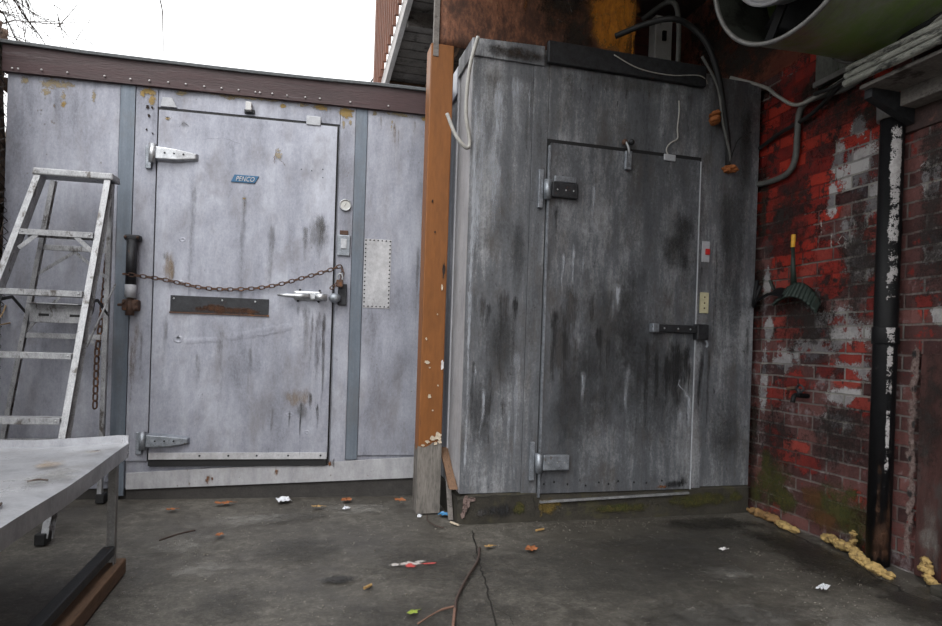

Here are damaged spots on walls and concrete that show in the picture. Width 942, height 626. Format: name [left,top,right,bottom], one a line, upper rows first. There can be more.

rust [591,0,637,54]
peeling [21,76,75,107]
peeling [826,113,903,300]
peeling [920,147,942,202]
rust [195,304,258,314]
peeling [914,294,942,326]
water stain [550,311,576,379]
peeling [885,327,896,395]
spalling [902,345,920,559]
crack [472,530,513,626]